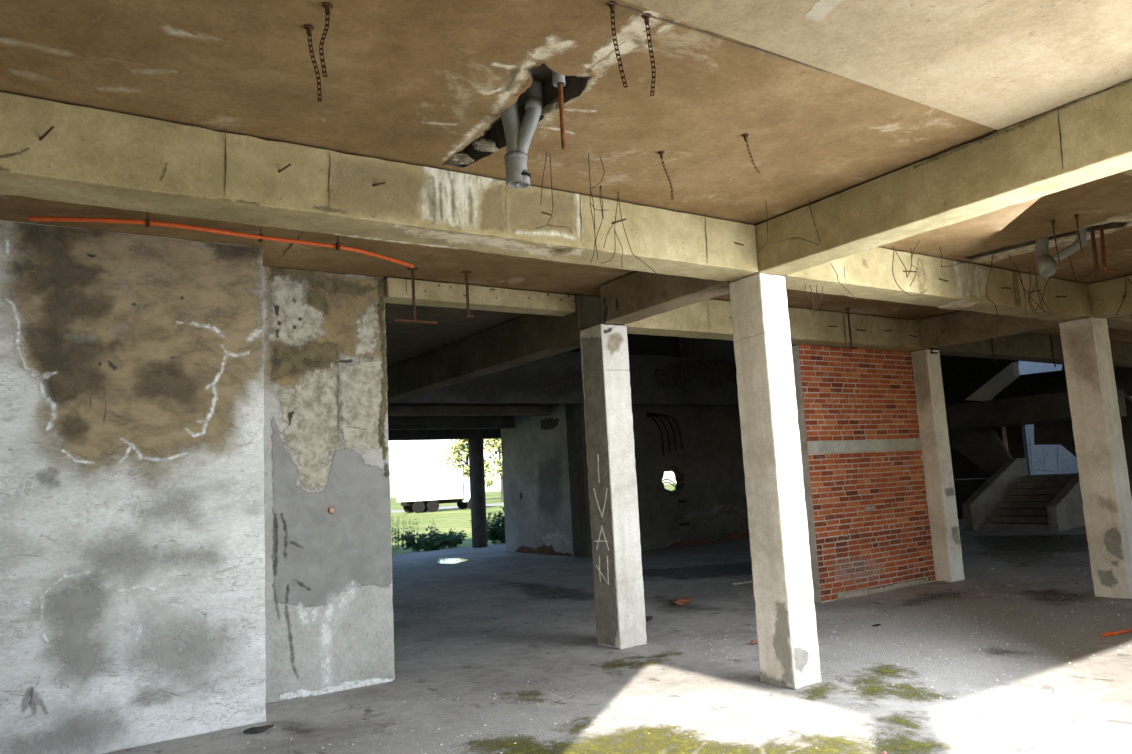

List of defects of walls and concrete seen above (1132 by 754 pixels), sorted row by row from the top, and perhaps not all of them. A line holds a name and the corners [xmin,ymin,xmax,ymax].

damp [583,10,677,88]
spalling [451,138,499,165]
damp [422,37,573,226]
spalling [541,97,559,116]
damp [516,194,581,241]
damp [0,221,385,473]
flaking render [268,275,390,490]